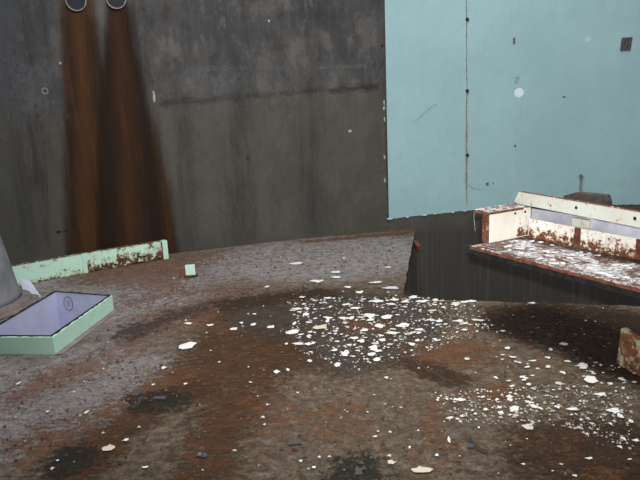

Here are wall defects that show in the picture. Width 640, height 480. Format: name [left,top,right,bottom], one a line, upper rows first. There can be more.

crack [465,0,479,201]
rust [0,0,410,480]
rust [393,299,640,459]
rust [490,411,640,480]